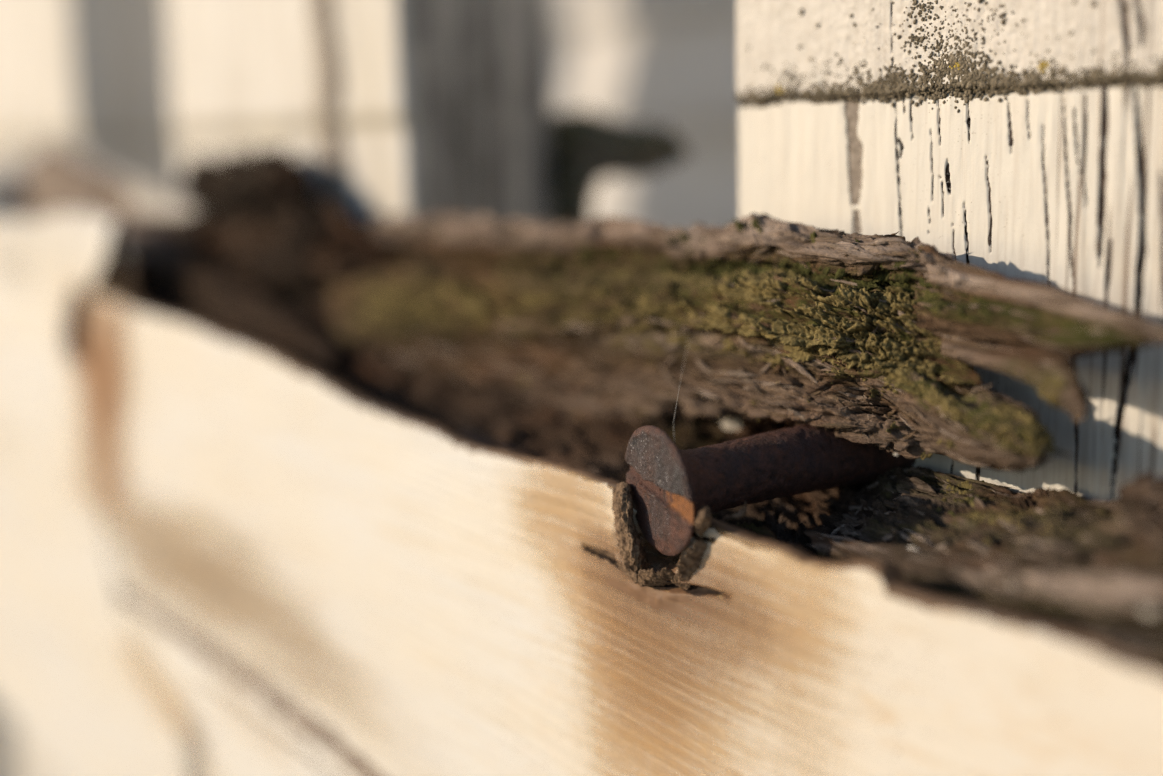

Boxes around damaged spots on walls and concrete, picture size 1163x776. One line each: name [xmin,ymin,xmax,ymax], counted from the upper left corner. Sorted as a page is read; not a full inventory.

peeling [845,95,863,234]
crack [895,89,1163,314]
crack [951,465,980,480]
crack [1071,420,1079,493]
crack [1110,349,1136,489]
peeling [586,518,707,590]